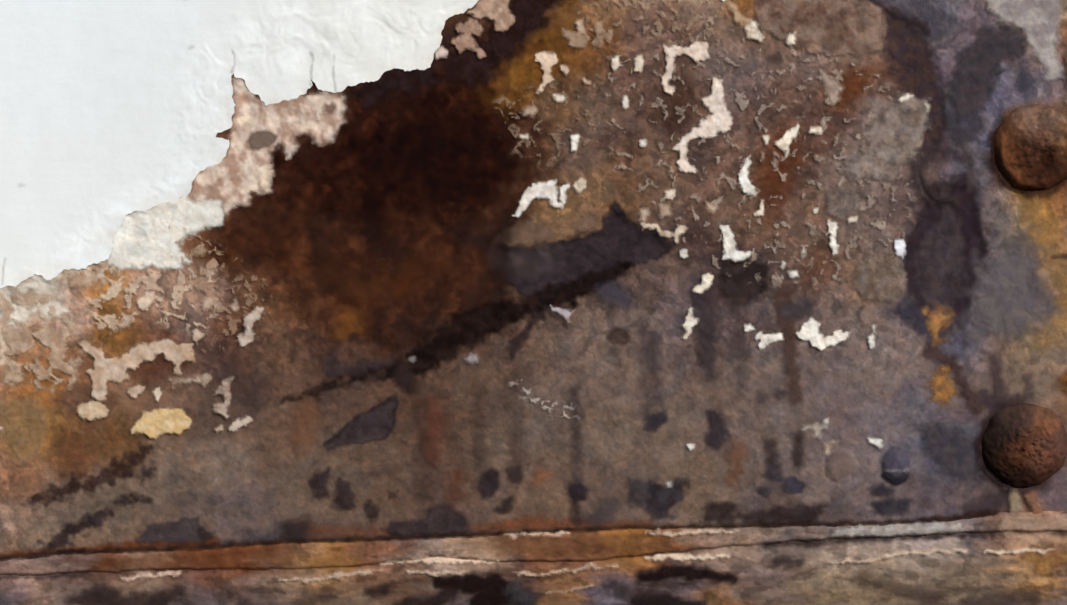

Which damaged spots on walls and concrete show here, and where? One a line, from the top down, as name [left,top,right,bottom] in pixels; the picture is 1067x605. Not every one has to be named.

peeling [468,0,515,31]
peeling [674,78,732,173]
rust [215,0,576,340]
peeling [513,180,570,217]
leakage [866,0,1034,413]
spalling [501,201,673,298]
peeling [796,318,849,350]
peeling [131,408,192,438]
leakage [0,385,1009,565]
leakage [71,570,186,605]
leakage [280,555,618,605]
leakage [638,553,738,583]